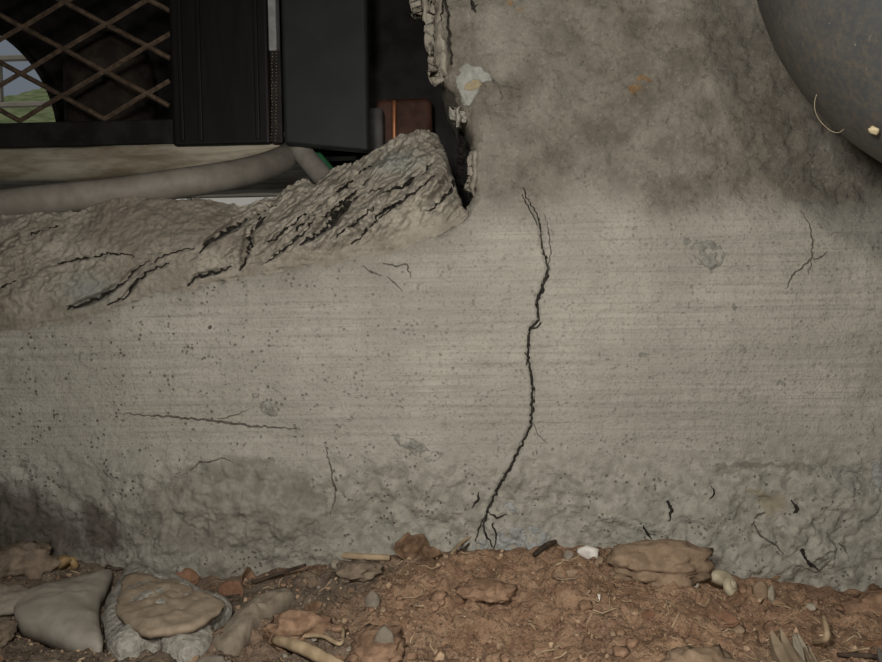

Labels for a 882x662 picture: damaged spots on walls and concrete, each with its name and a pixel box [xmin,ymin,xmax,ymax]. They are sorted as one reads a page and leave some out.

spalling [0,0,491,332]
crack [472,187,552,549]